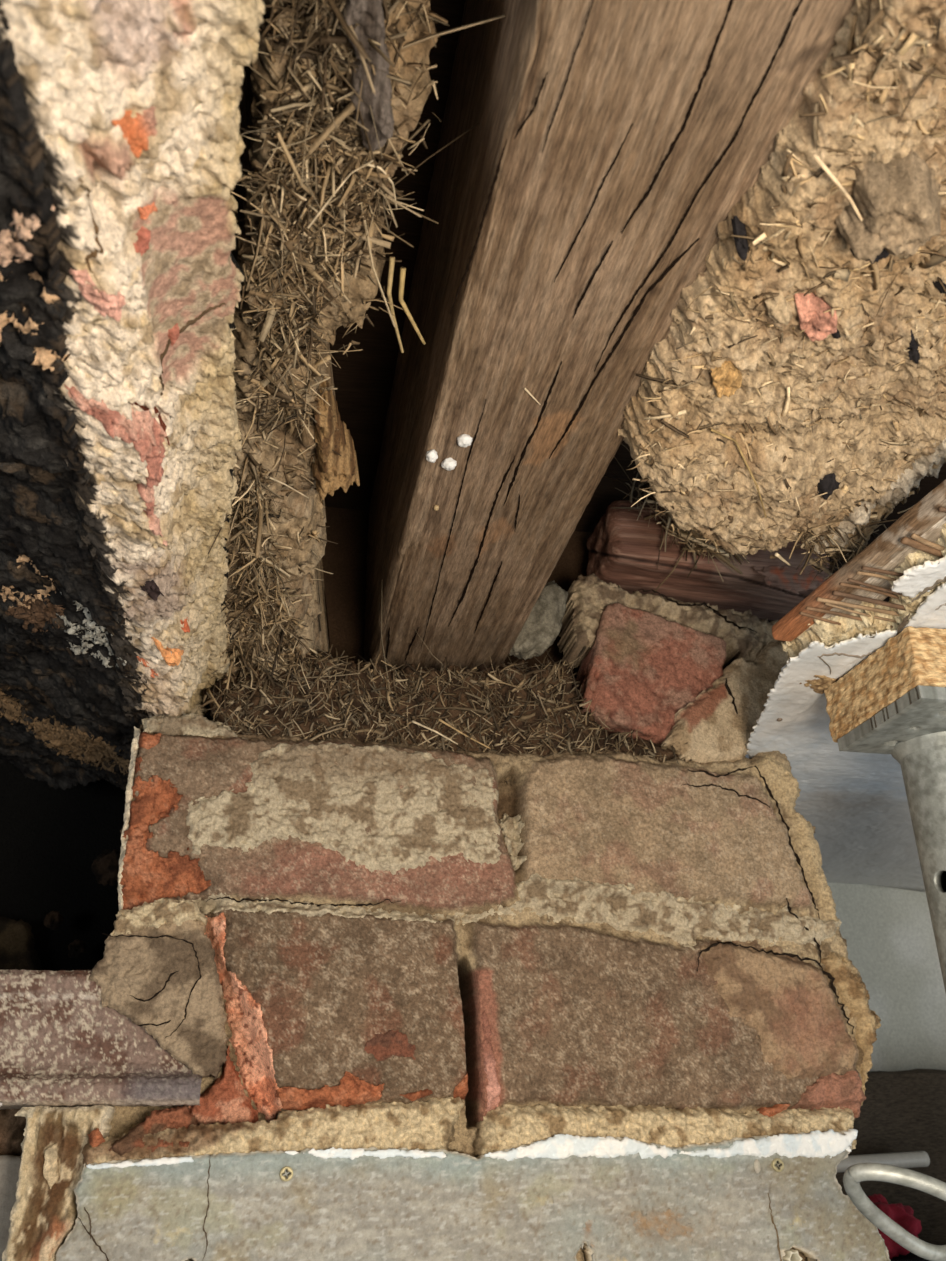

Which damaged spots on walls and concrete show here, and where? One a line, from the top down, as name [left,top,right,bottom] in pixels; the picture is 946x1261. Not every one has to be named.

spalling [0,0,265,910]
crack [681,766,854,1034]
crack [102,933,202,1038]
spalling [2,912,385,1261]
peeling [285,1147,447,1160]
peeling [484,1071,867,1161]
crack [79,1207,109,1261]
crack [203,1159,211,1259]
crack [768,1193,782,1261]